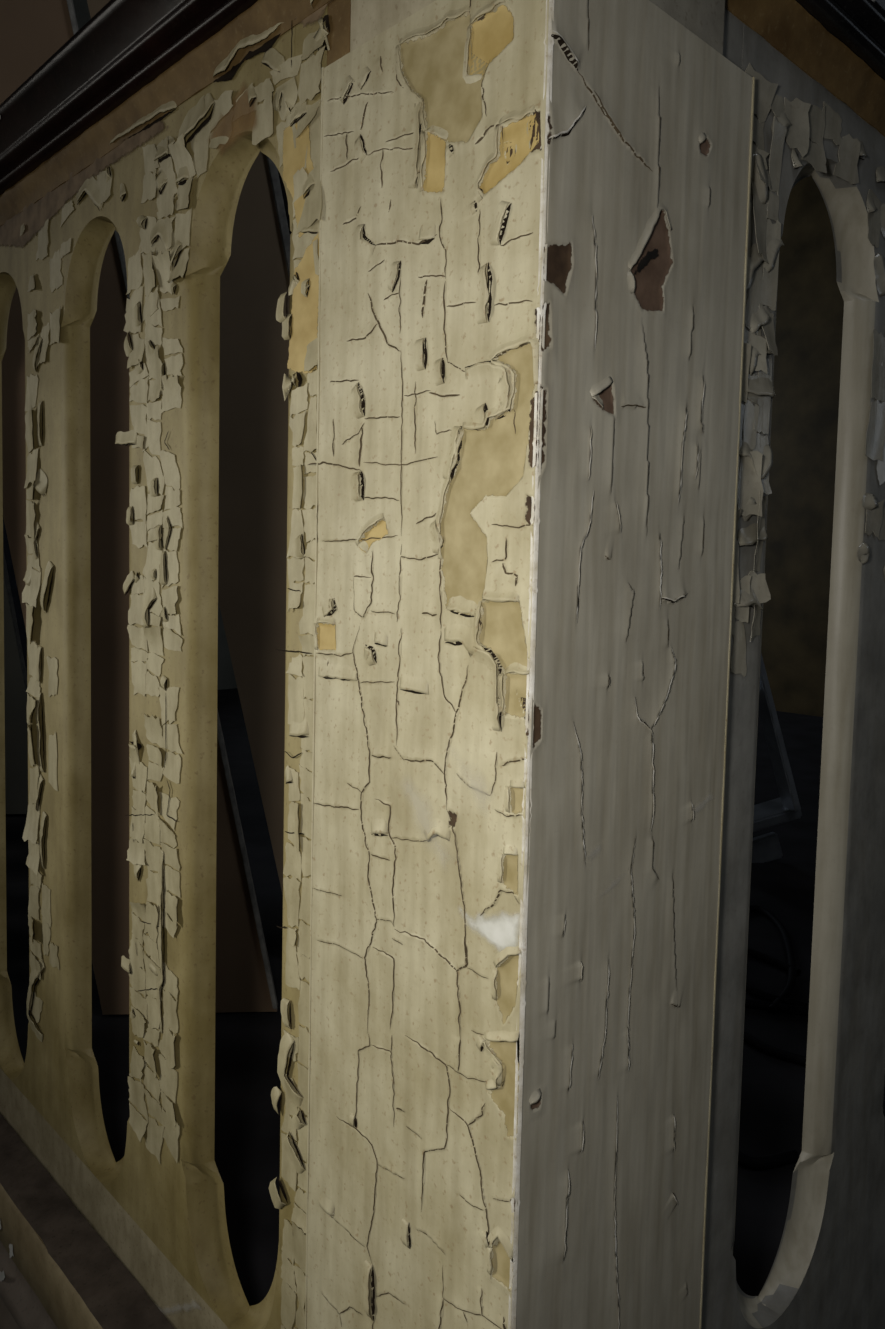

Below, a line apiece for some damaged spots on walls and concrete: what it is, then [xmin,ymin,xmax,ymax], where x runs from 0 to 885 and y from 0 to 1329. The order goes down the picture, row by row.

peeling [395,0,539,197]
crack [548,9,661,176]
peeling [627,203,673,311]
peeling [730,63,885,677]
peeling [355,513,388,553]
peeling [435,334,539,717]
peeling [0,0,336,1329]
crack [308,56,533,1329]
peeling [497,844,518,895]
crack [548,306,705,1329]
peeling [482,946,542,1136]
peeling [486,1226,513,1292]